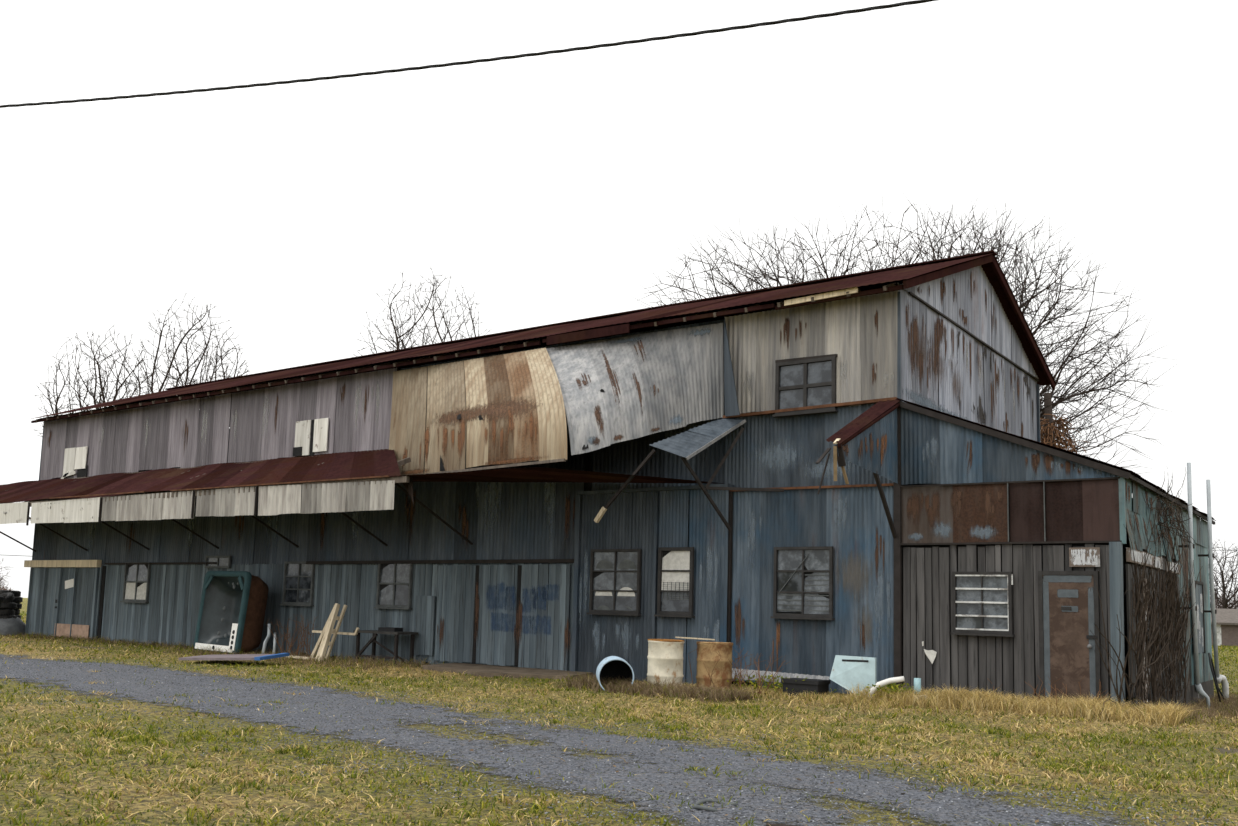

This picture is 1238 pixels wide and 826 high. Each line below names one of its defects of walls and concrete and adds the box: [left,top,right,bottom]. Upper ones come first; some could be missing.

corrosion [602,353,659,414]
corrosion [780,318,807,348]
corrosion [906,272,1034,437]
corrosion [592,406,623,444]